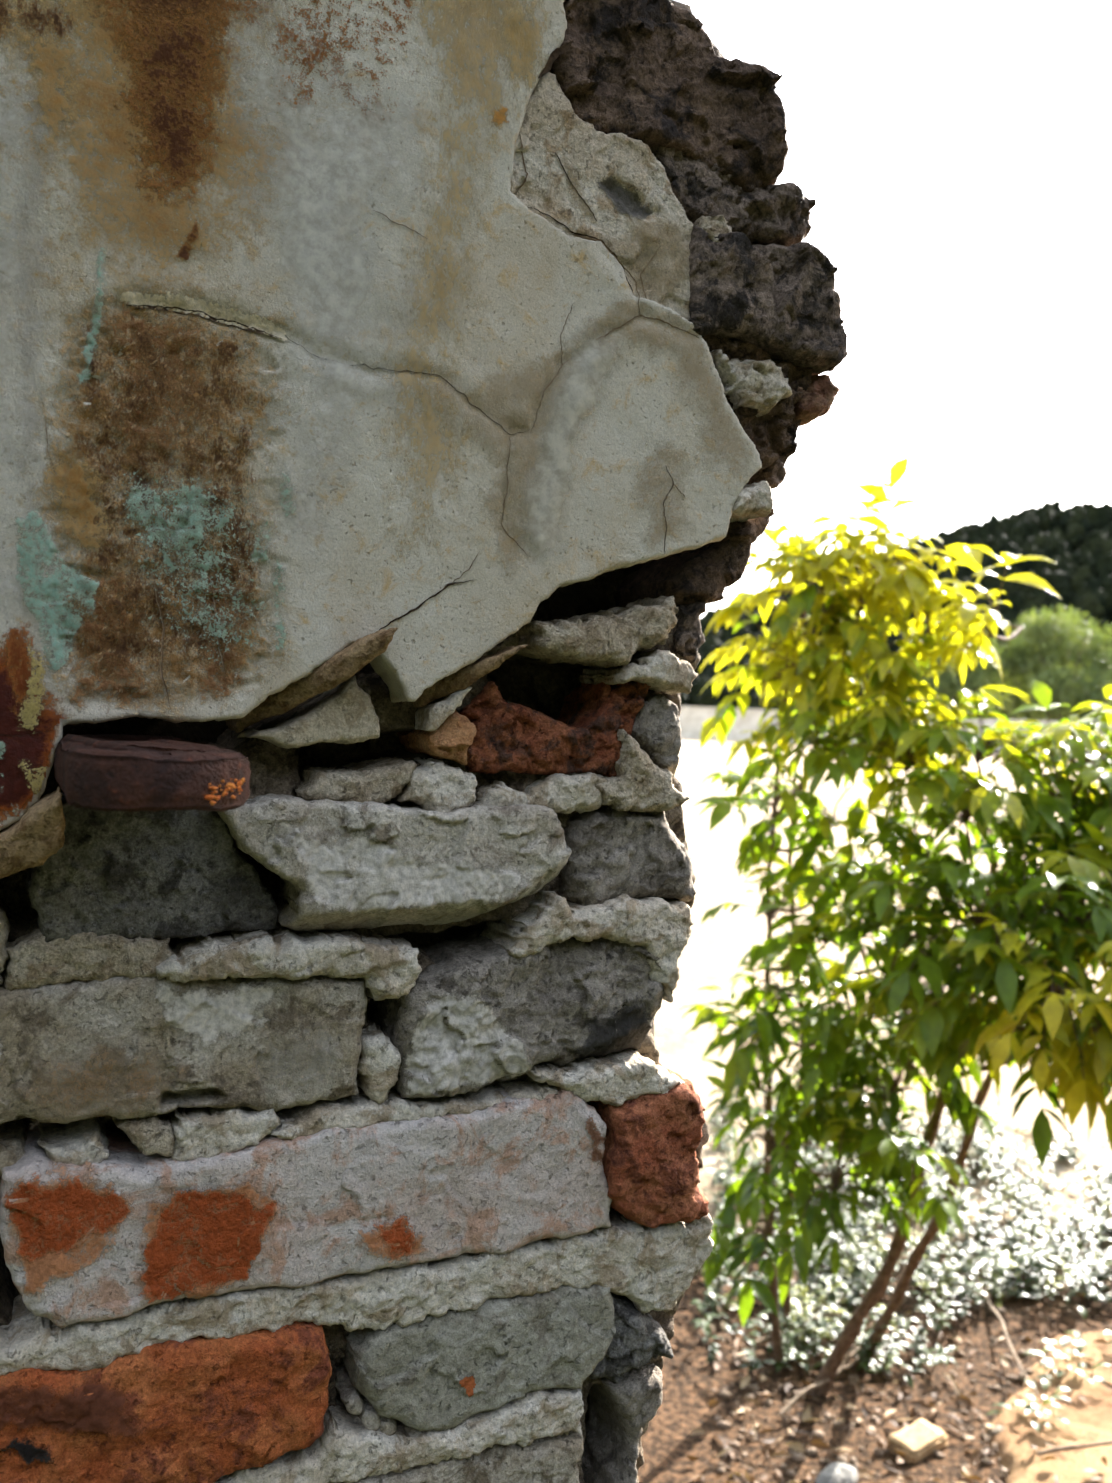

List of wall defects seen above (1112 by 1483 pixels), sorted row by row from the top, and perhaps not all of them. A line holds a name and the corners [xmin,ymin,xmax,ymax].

rust [0,0,441,322]
crack [285,234,700,557]
crack [379,554,478,630]
rust [0,623,66,828]
rust [204,778,245,805]